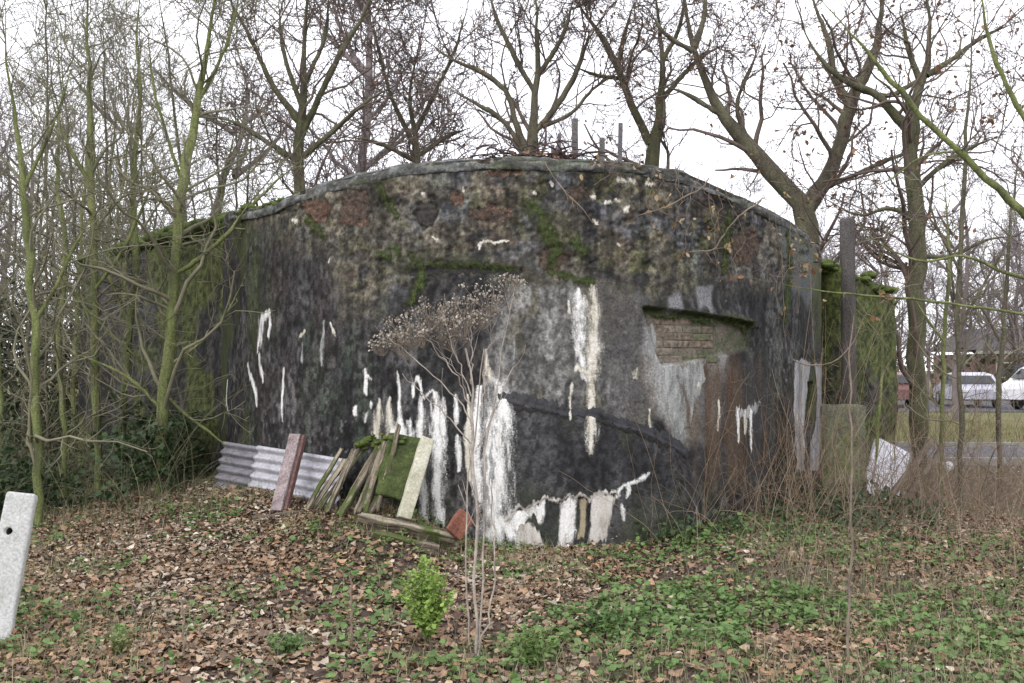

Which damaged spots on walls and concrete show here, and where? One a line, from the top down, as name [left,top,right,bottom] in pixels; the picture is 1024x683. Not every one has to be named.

water stain [247,309,272,407]
water stain [320,321,336,366]
water stain [353,349,518,544]
water stain [568,284,601,454]
spalling [647,324,656,360]
spalling [662,362,706,435]
water stain [736,401,760,452]